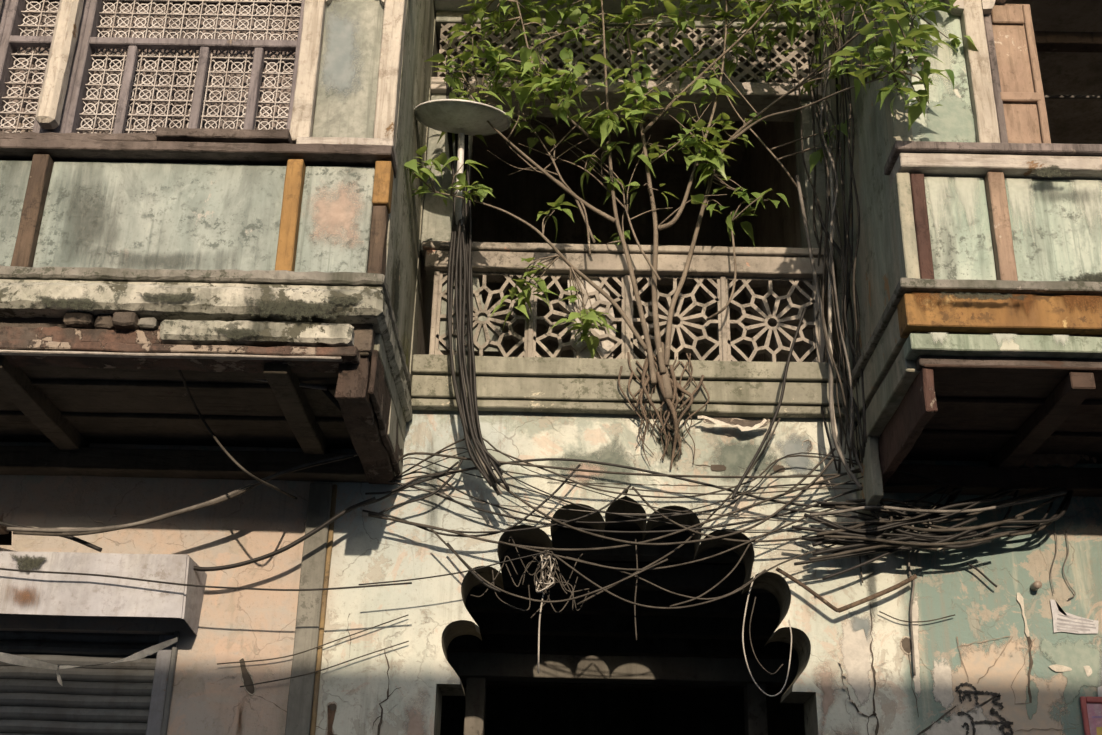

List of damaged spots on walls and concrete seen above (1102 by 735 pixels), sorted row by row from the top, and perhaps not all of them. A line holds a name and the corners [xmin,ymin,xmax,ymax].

crack [372,650,401,735]
crack [840,603,879,735]
crack [908,653,956,735]
peeling [900,594,1102,735]
crack [956,593,1076,731]